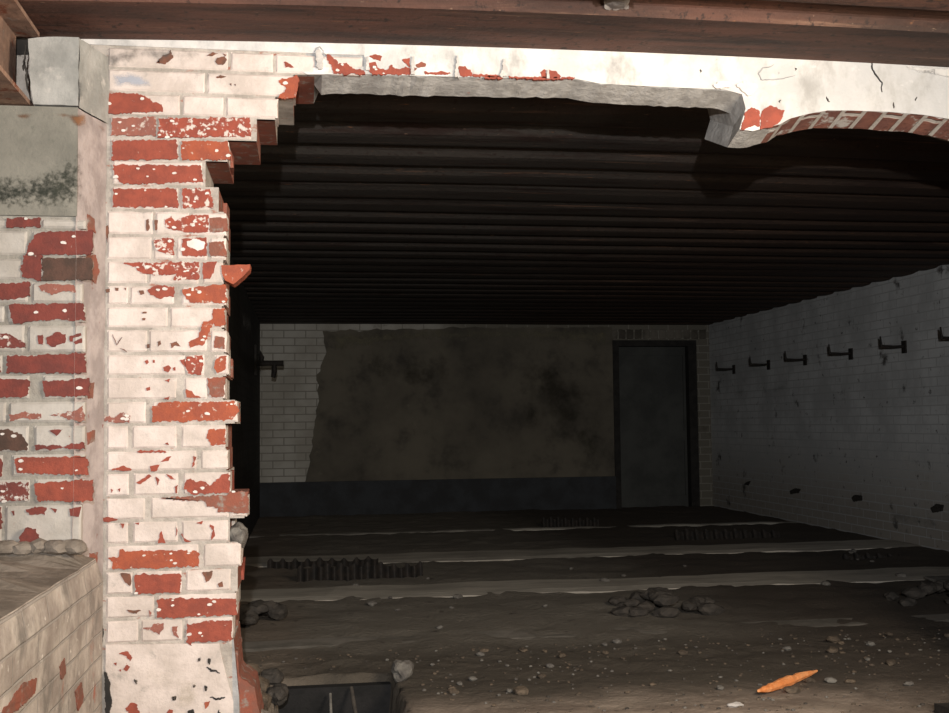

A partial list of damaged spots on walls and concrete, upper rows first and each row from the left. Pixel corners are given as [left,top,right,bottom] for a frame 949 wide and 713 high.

crack [22,45,32,102]
peeling [157,50,173,64]
peeling [207,52,236,86]
peeling [325,53,575,81]
crack [871,63,917,108]
spalling [740,105,785,131]
leakage [0,170,76,204]
peeling [108,92,252,446]
peeling [0,214,109,529]
peeling [136,442,249,514]
peeling [89,528,237,646]
peeling [125,703,140,713]